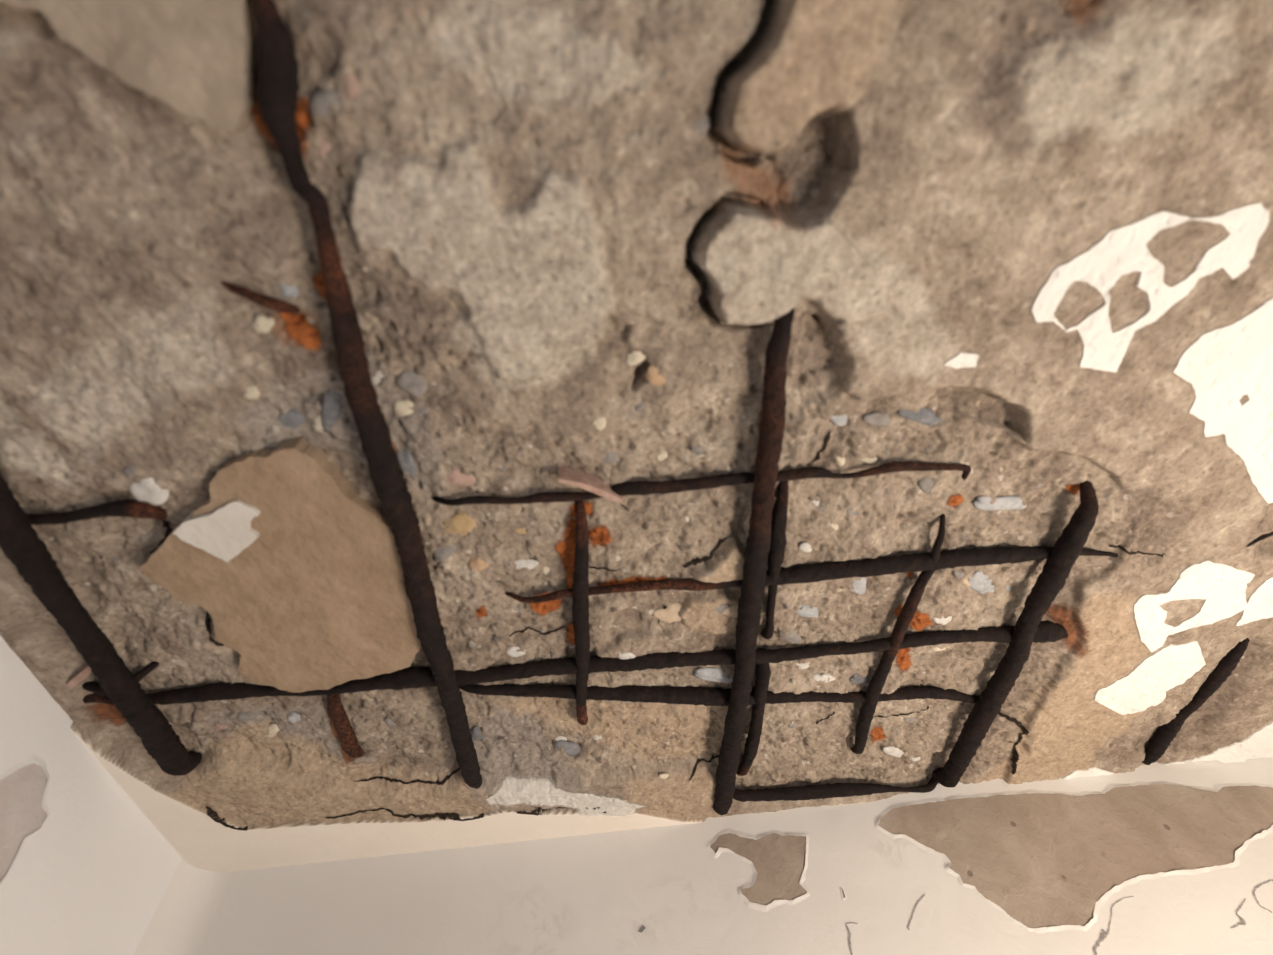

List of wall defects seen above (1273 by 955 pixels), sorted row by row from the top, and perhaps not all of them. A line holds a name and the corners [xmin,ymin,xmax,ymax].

peeling [1030,203,1269,373]
corrosion [280,312,321,350]
spalling [0,0,1138,829]
corrosion [530,502,612,616]
corrosion [894,604,932,632]
corrosion [1047,605,1087,656]
spalling [1062,560,1273,780]
crack [325,767,484,821]
crack [517,807,606,816]
peeling [874,780,1273,934]
crack [1093,896,1134,955]
crack [1231,880,1273,928]